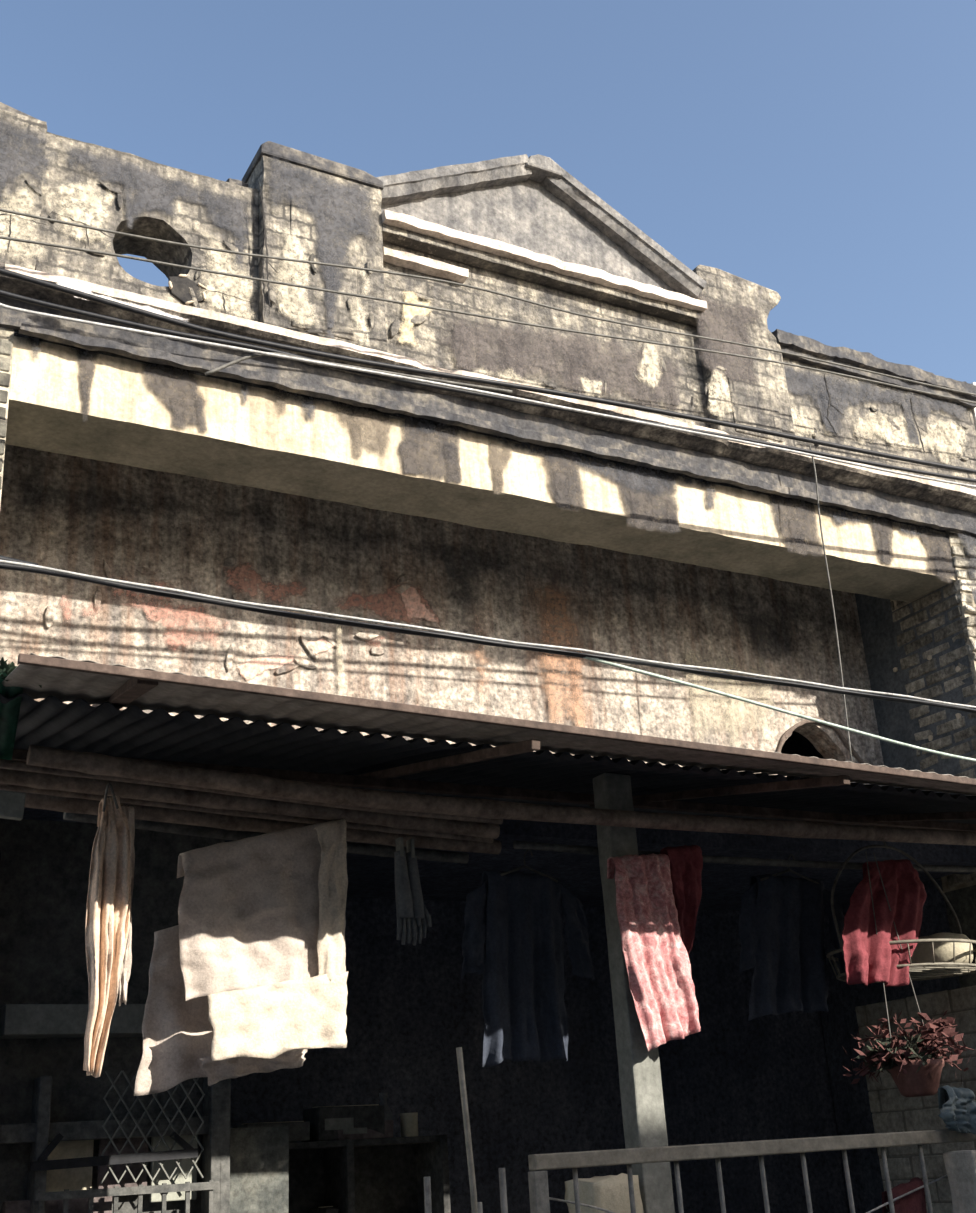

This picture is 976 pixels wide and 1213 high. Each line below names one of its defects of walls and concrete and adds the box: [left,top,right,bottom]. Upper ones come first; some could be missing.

damp [0,122,250,279]
damp [269,158,371,339]
damp [14,330,41,356]
damp [68,345,99,415]
damp [144,361,207,432]
damp [274,388,715,532]
damp [446,318,680,409]
spalling [632,344,667,387]
spalling [705,366,734,419]
spalling [791,408,819,448]
damp [784,366,966,445]
spalling [854,405,970,464]